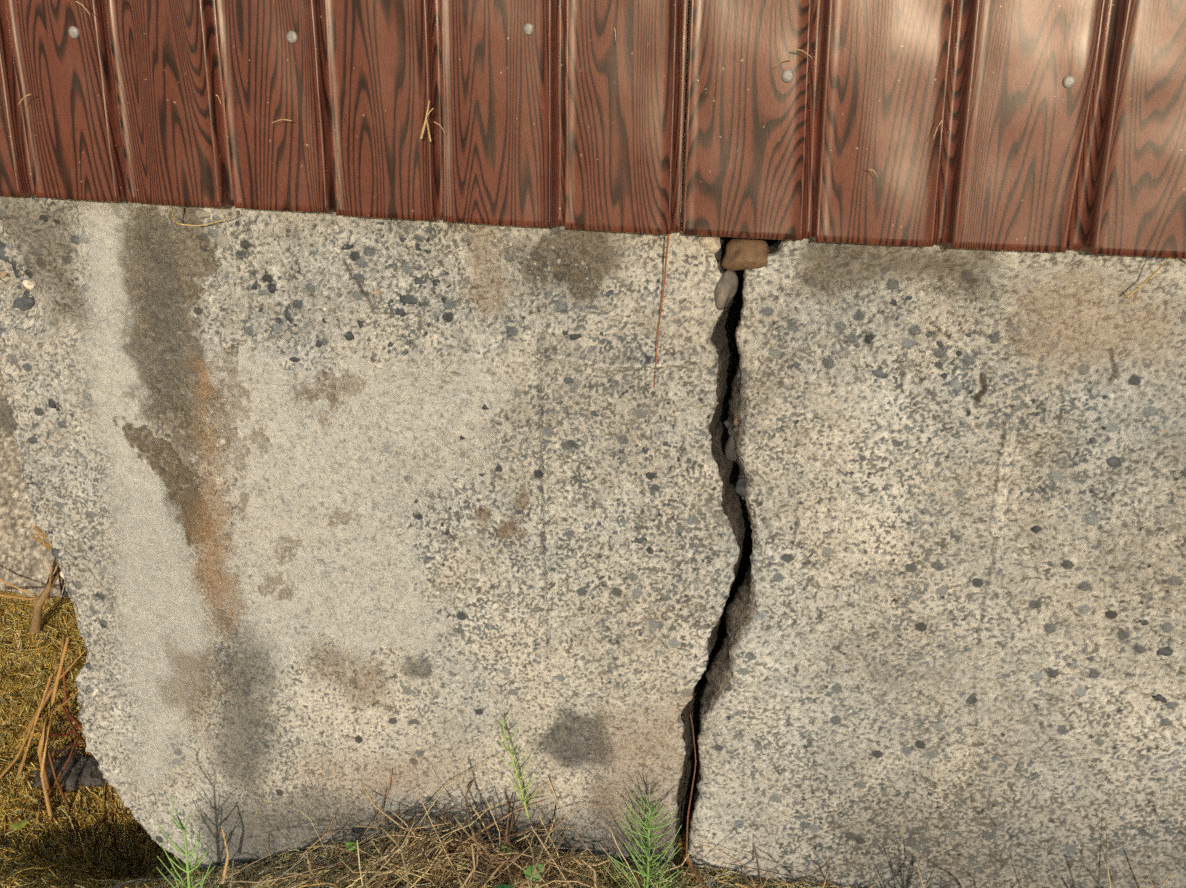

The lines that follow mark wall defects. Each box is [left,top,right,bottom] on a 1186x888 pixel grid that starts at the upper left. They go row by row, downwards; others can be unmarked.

leakage [84,201,220,782]
leakage [544,717,611,764]
crack [673,237,784,867]